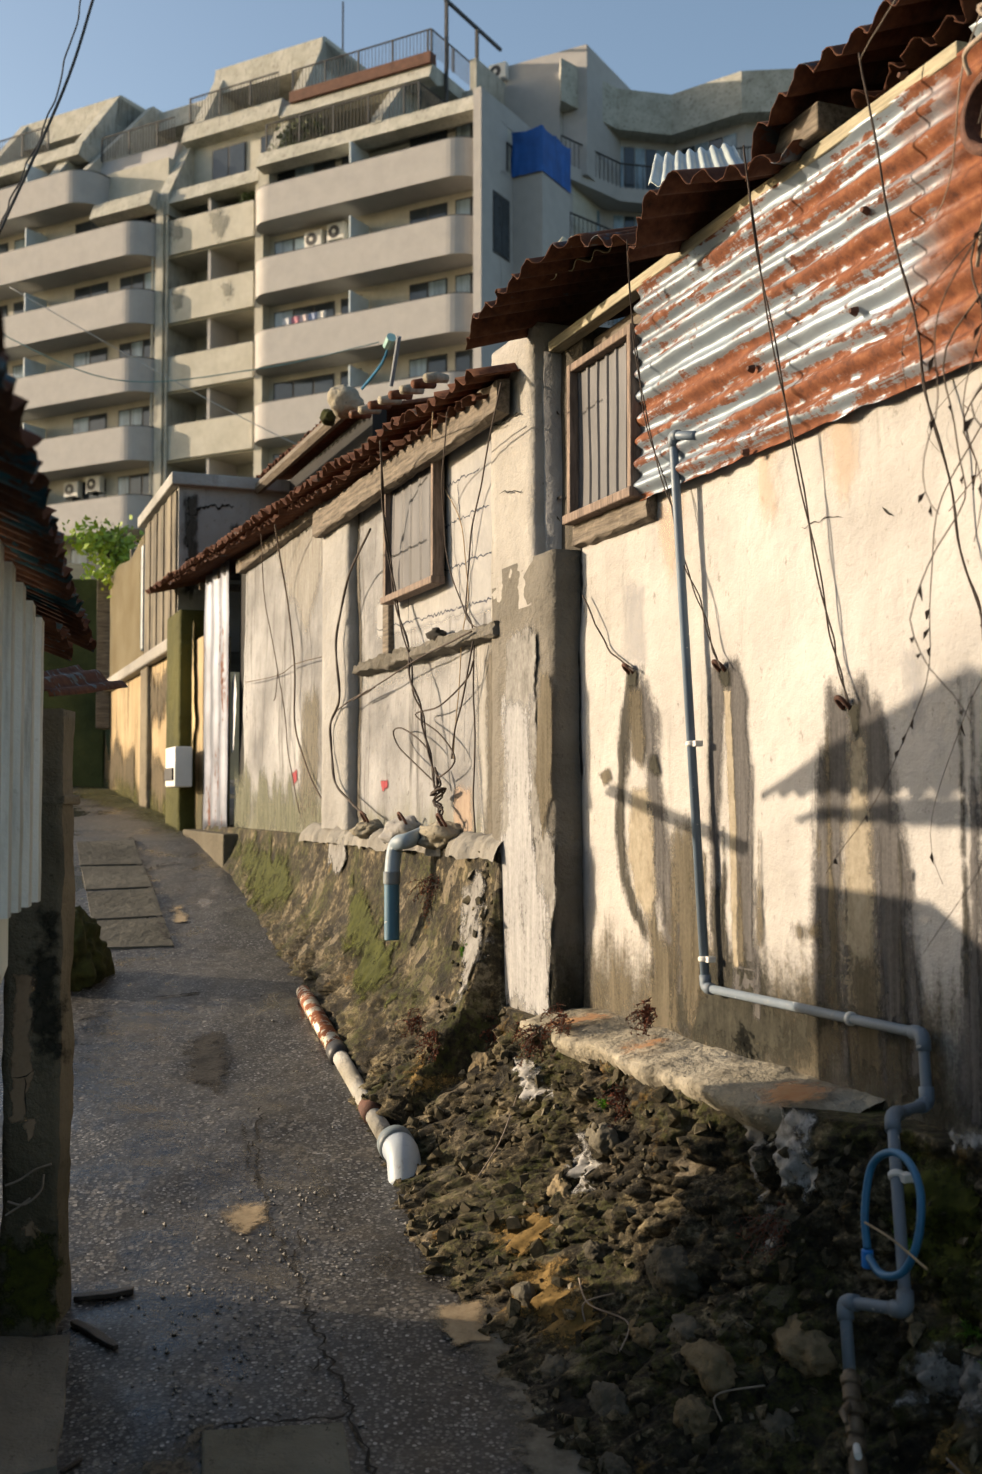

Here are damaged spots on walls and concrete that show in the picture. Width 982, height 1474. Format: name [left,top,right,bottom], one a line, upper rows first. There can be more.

peeling [8,974,37,1142]
peeling [454,622,555,1015]
water stain [552,659,982,1151]
crack [216,1106,378,1474]